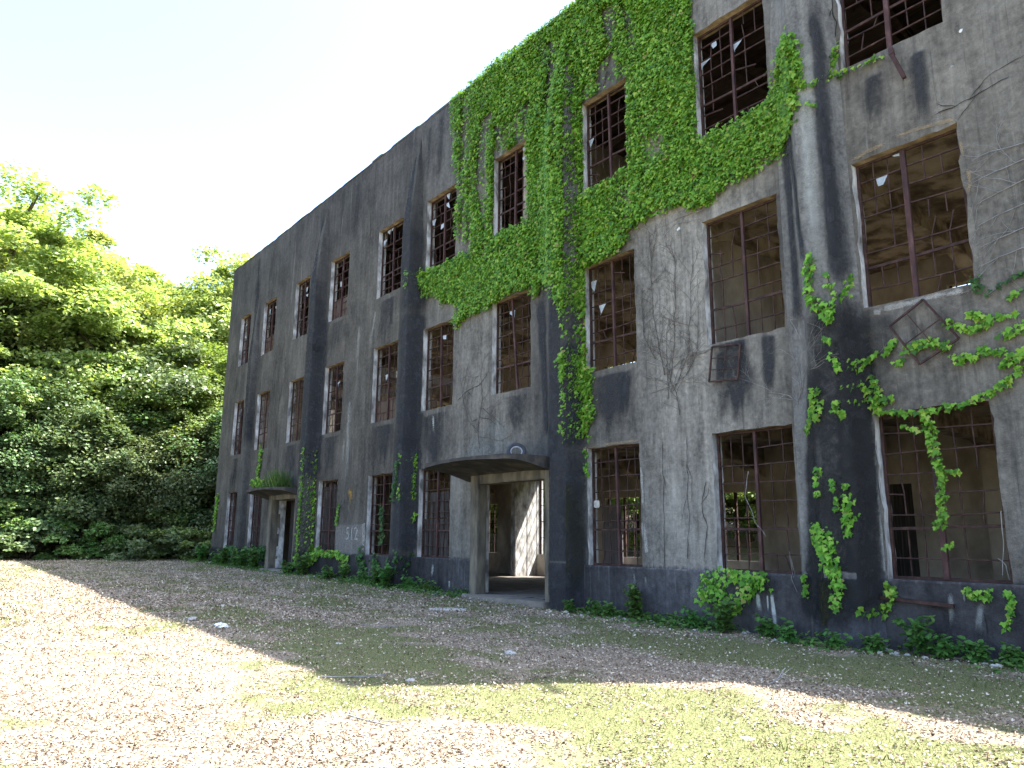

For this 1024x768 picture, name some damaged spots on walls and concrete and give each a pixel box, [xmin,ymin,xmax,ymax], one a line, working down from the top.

water stain [865,75,881,111]
water stain [911,51,928,107]
water stain [804,15,851,278]
water stain [717,340,750,414]
water stain [762,336,775,386]
water stain [782,133,884,624]